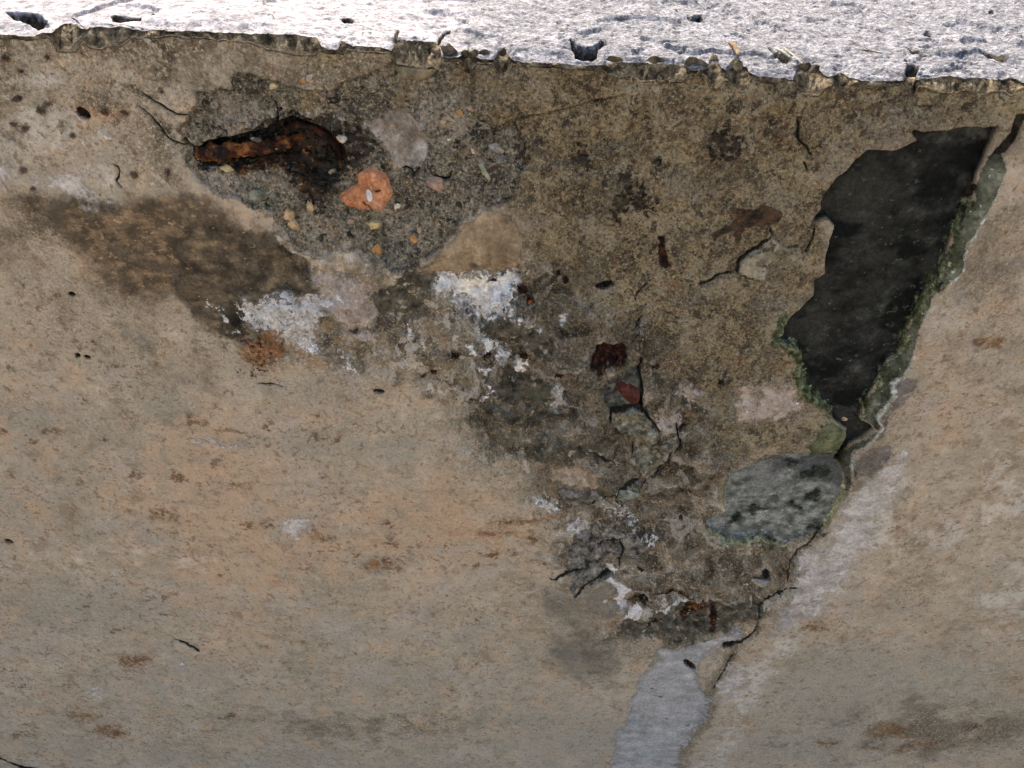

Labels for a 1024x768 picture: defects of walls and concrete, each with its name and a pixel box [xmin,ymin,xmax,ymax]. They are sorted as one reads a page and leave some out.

efflorescence [32,171,99,210]
rust [186,109,380,215]
spalling [176,61,527,343]
damp [172,217,343,366]
damp [369,268,587,428]
rust [590,342,628,377]
spalling [706,126,995,543]
damp [518,434,623,465]
flaking render [547,464,600,490]
flaking render [657,412,686,437]
spalling [566,520,689,621]
crack [712,521,826,689]